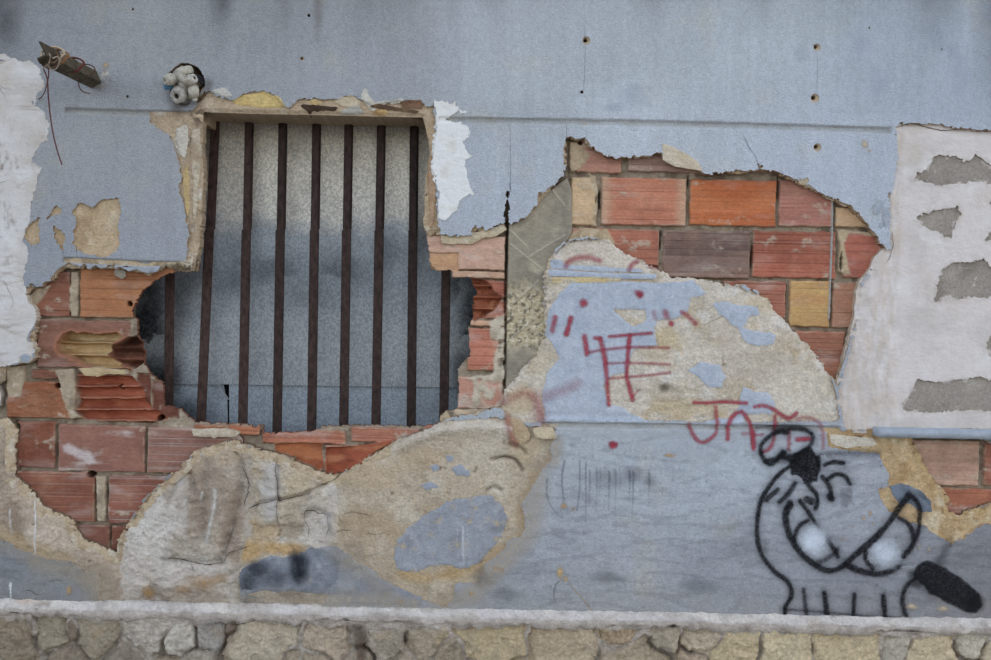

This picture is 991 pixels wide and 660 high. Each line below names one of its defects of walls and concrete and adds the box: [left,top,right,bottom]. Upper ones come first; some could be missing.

peeling [0,87,991,607]